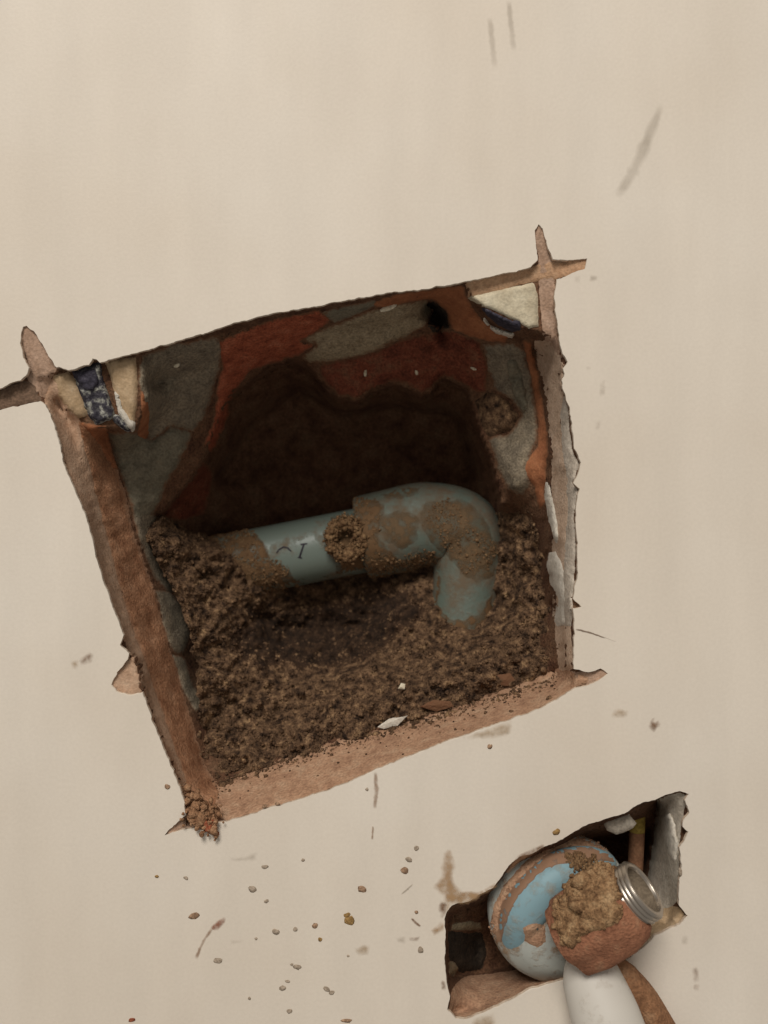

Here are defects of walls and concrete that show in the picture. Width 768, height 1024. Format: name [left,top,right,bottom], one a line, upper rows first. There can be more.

spalling [23,368,74,411]
spalling [79,346,167,432]
spalling [119,473,164,618]
spalling [154,281,581,676]
spalling [113,639,181,780]
spalling [168,639,243,785]
spalling [445,791,688,1016]